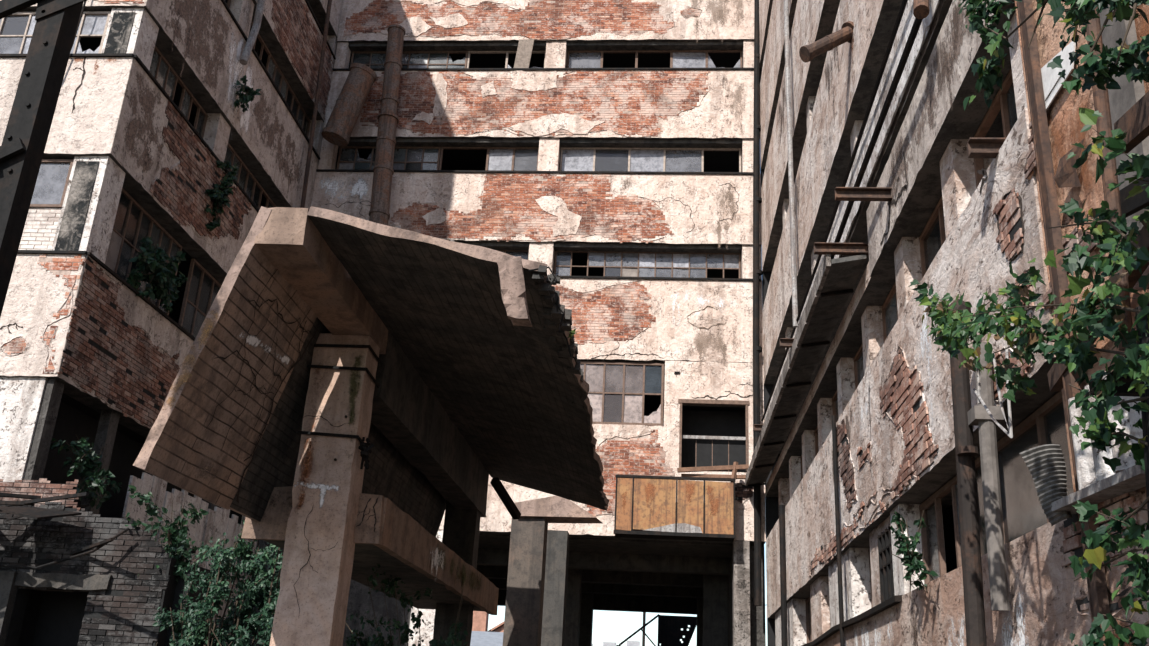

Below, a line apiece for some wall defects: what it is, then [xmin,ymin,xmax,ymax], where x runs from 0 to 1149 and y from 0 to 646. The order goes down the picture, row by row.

peeling [397,70,711,138]